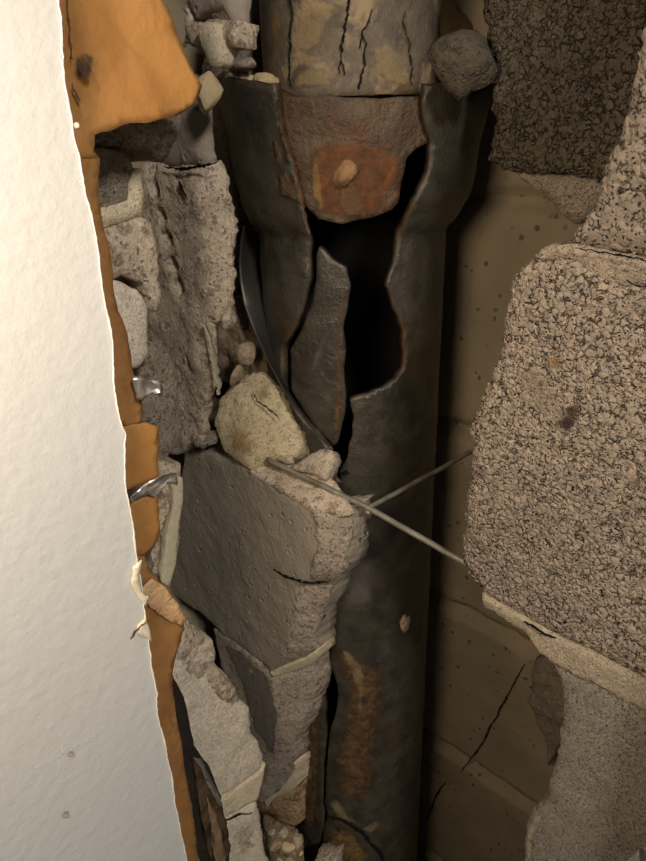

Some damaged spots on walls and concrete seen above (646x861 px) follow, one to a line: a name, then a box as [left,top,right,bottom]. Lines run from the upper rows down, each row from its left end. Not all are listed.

corrosion [311,144,397,215]
spalling [249,461,355,668]
spalling [177,621,277,753]
corrosion [337,652,382,800]
crack [426,664,525,821]
spalling [528,654,565,766]